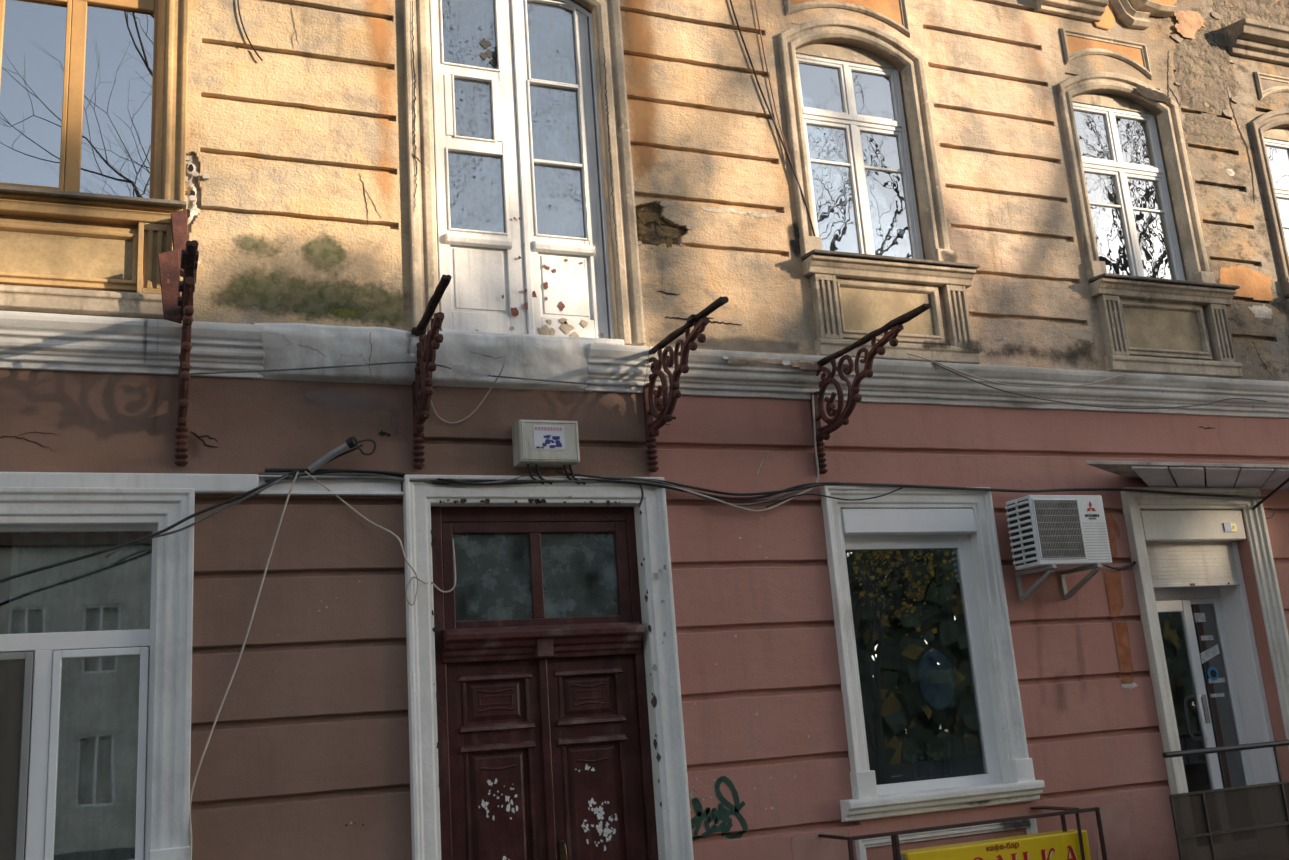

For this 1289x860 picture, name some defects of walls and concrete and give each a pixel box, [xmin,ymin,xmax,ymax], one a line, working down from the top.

flaking render [1136,0,1289,149]
flaking render [635,201,694,248]
flaking render [1219,265,1273,319]
crack [0,432,56,452]